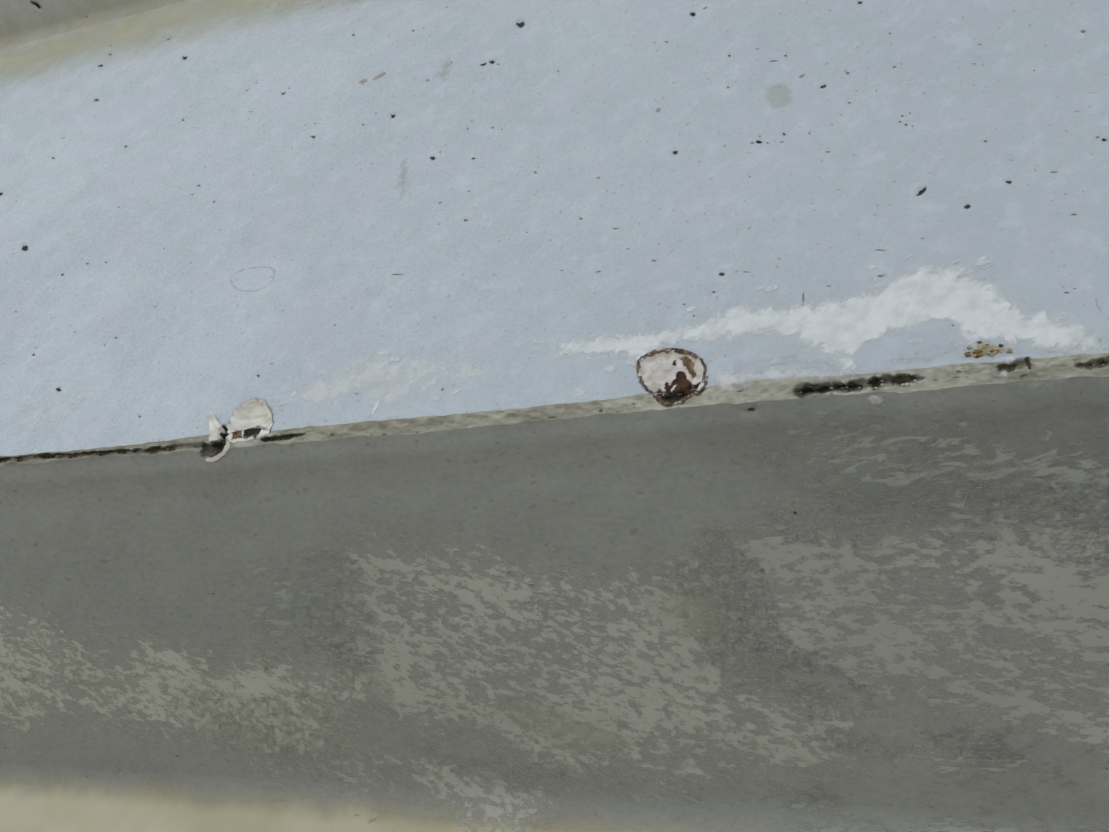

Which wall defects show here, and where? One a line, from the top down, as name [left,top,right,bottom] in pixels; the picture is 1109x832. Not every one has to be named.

damp [558,257,1100,373]
damp [718,369,797,389]
peeling [0,348,1109,832]